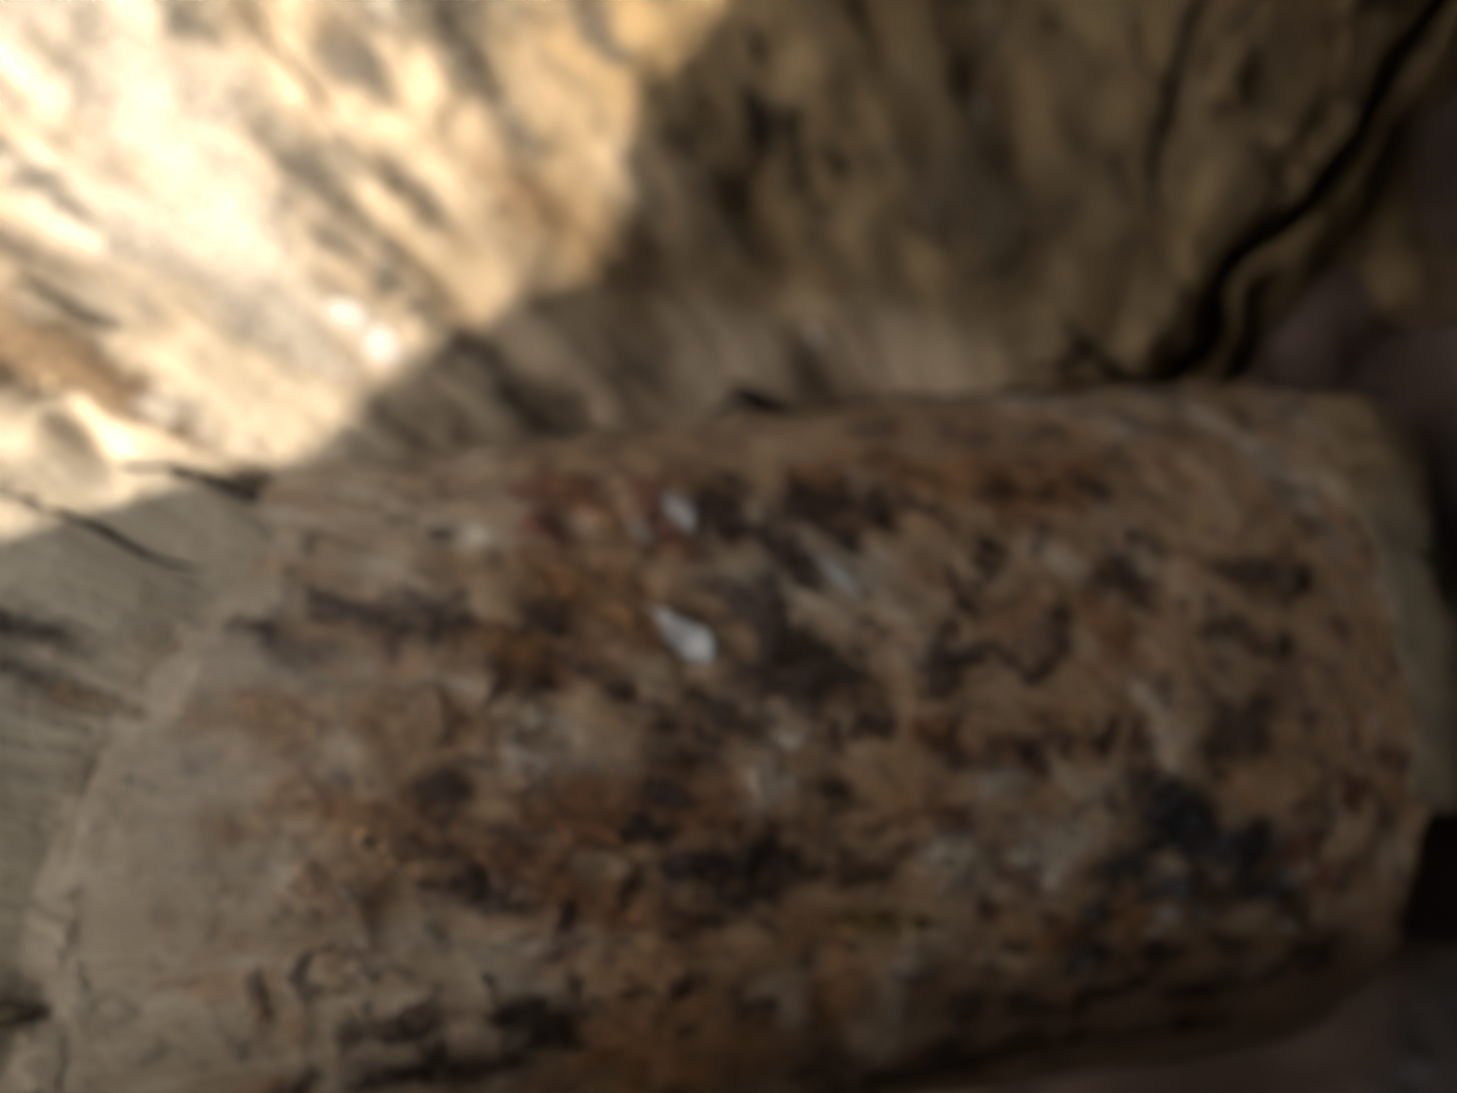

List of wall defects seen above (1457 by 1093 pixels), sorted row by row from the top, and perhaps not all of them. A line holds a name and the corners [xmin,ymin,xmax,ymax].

crack [117,459,264,505]
crack [0,494,207,571]